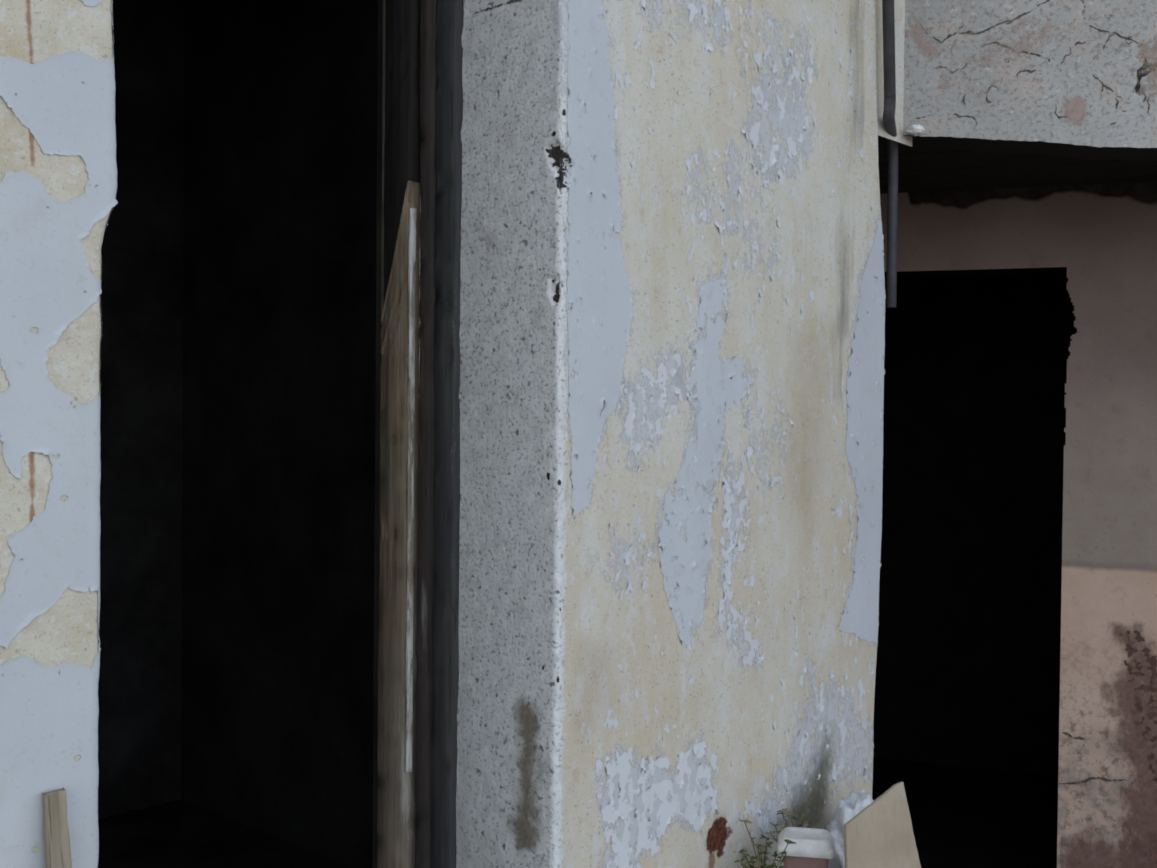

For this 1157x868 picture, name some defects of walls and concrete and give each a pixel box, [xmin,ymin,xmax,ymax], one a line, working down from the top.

peeling [0,0,114,69]
crack [916,0,1157,128]
spalling [1131,38,1157,101]
peeling [0,89,94,208]
peeling [41,196,118,409]
peeling [545,0,886,868]
peeling [0,423,59,615]
peeling [0,578,101,675]
leakage [513,705,538,848]
rust [707,813,733,868]
leakage [1061,626,1157,868]